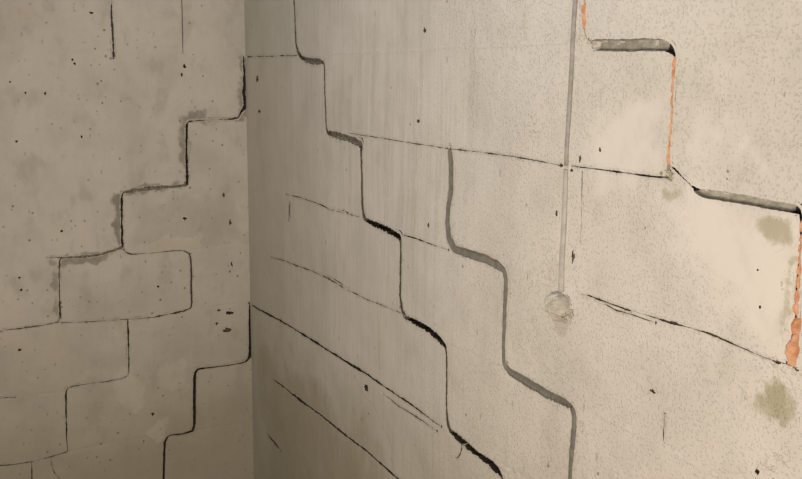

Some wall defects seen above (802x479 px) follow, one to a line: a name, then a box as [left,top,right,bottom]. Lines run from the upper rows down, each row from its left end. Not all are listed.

crack [0,0,579,479]
crack [571,0,802,367]